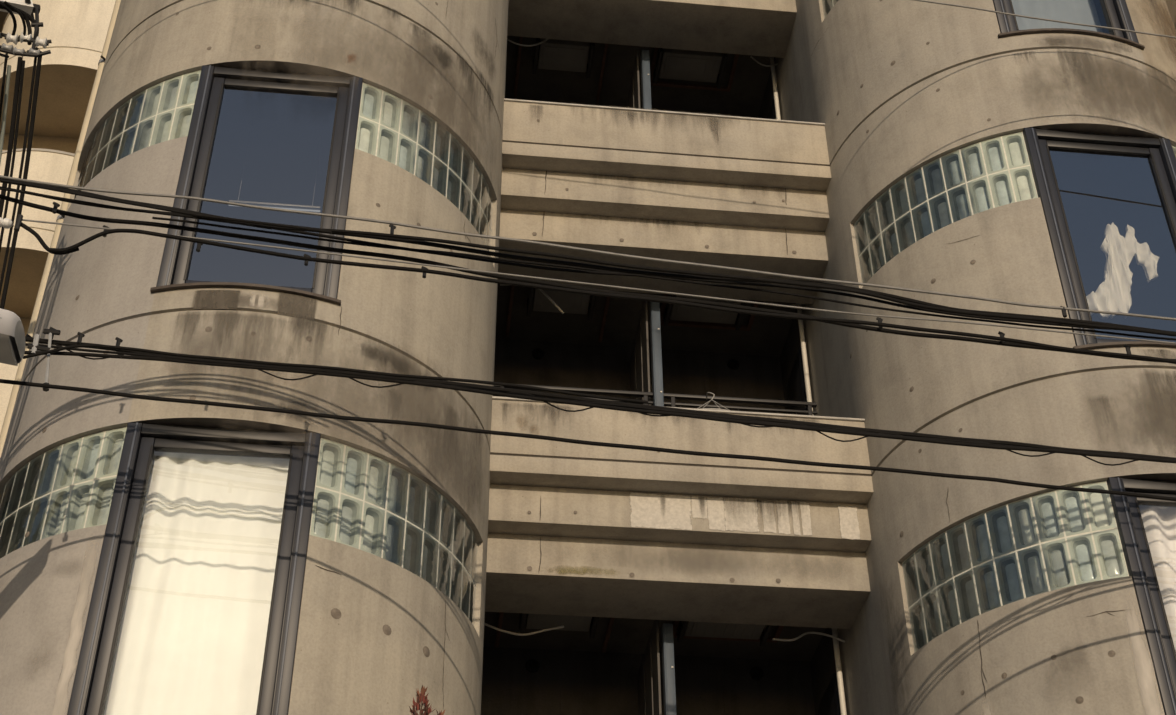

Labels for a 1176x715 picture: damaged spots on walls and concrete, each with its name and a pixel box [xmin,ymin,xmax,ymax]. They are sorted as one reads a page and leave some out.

leakage [422,46,491,99]
leakage [185,290,325,327]
peeling [629,492,812,536]
peeling [838,506,860,539]
crack [977,620,987,697]